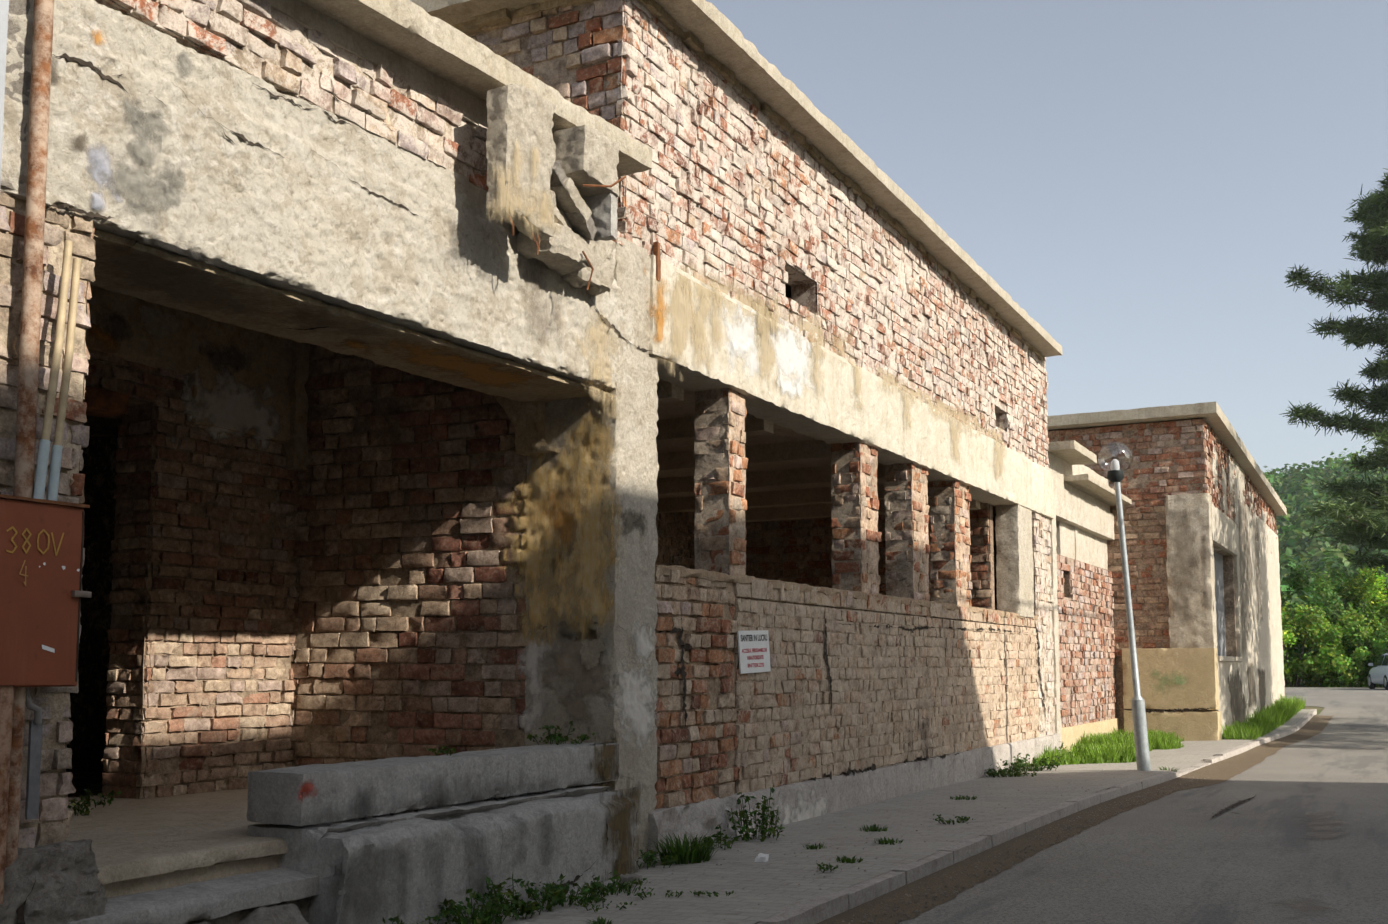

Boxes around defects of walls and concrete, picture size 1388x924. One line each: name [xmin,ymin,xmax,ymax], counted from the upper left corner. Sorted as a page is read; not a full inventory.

crack [52,53,439,223]
spalling [550,161,626,290]
rust [653,285,665,342]
crack [618,620,692,727]